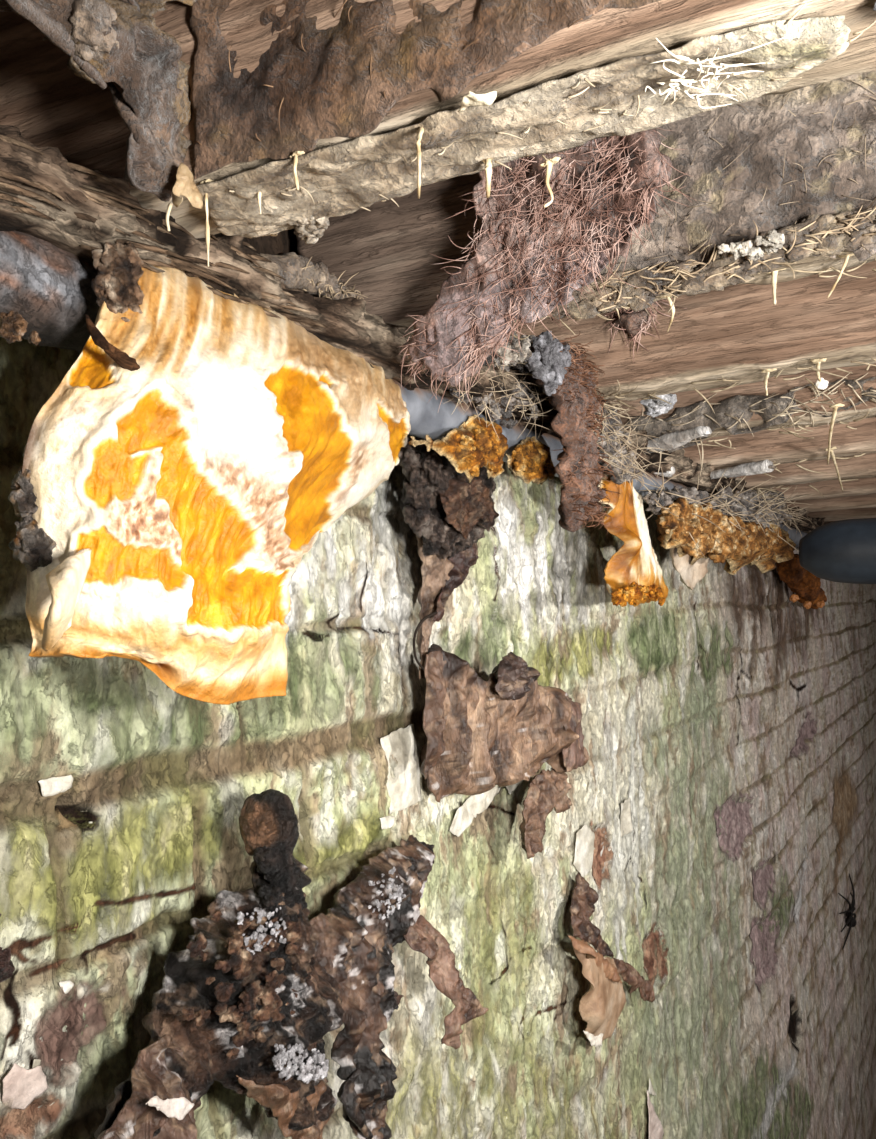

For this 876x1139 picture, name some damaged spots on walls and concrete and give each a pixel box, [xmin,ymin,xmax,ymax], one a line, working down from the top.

peeling [450,780,523,837]
spalling [0,947,11,974]
spalling [181,911,315,1059]
spalling [642,923,669,988]
peeling [146,1096,194,1120]